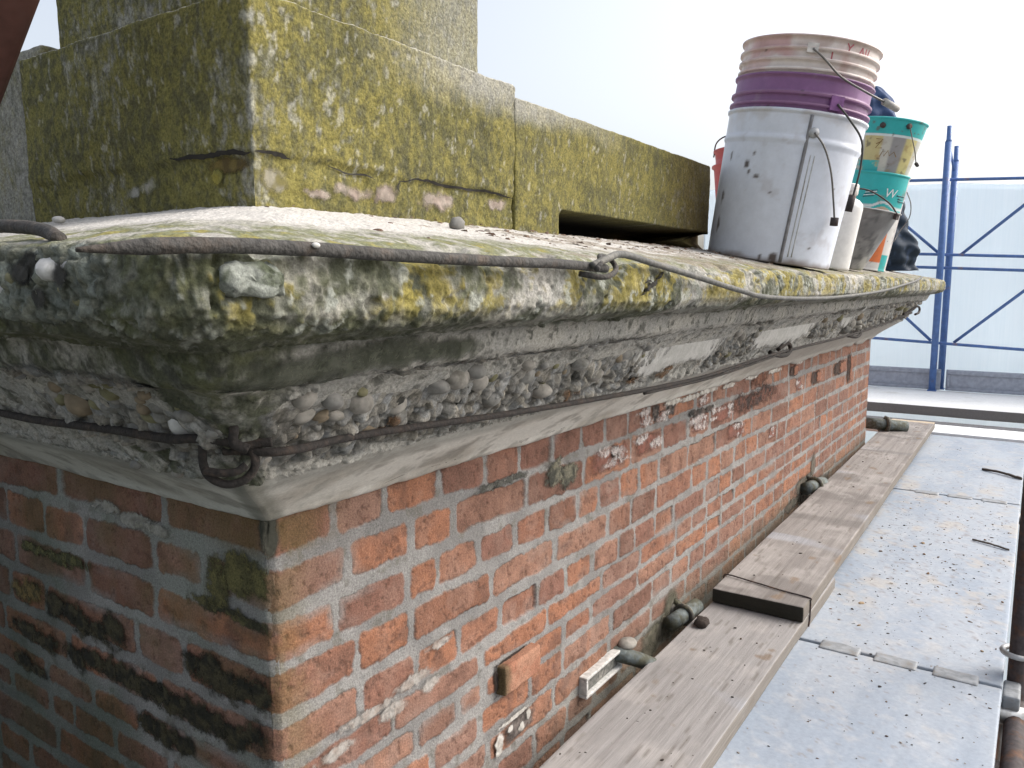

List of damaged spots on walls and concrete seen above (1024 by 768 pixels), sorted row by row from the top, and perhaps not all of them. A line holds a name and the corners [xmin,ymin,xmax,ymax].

crack [170,149,290,161]
crack [327,165,513,199]
spalling [705,321,774,368]
spalling [3,365,223,461]
spalling [259,337,659,465]
water stain [691,393,745,439]
peeling [666,361,803,406]
spalling [812,355,853,384]